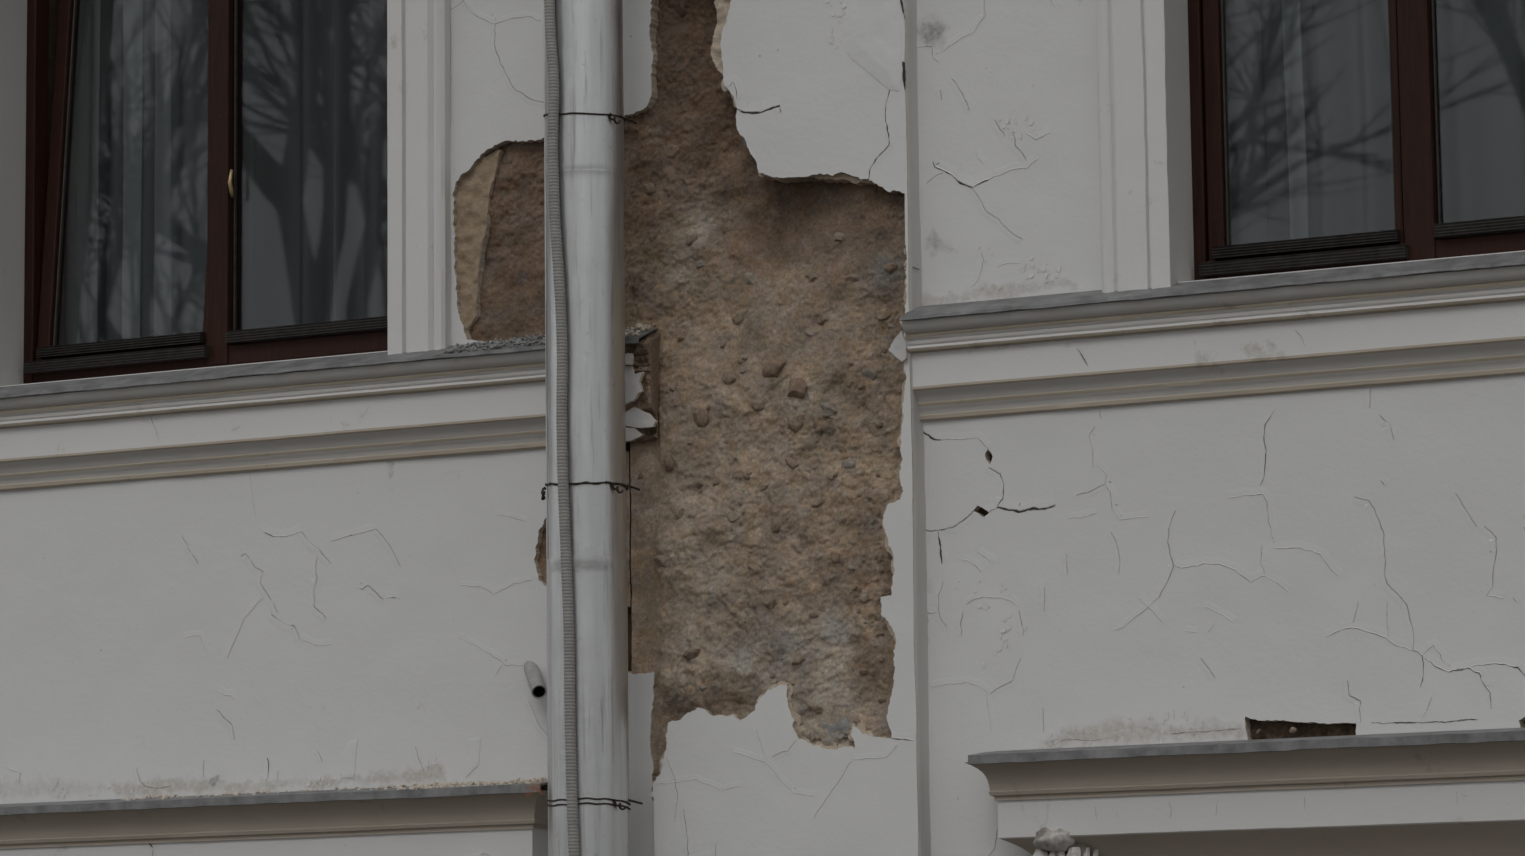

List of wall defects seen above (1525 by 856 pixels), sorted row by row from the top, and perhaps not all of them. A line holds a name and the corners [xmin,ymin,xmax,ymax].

crack [725,74,781,115]
crack [868,90,895,181]
crack [917,40,1050,244]
flaking render [455,142,545,342]
flaking render [624,0,908,777]
crack [923,422,1055,564]
crack [308,522,401,623]
flaking render [538,528,549,585]
crack [1226,407,1525,724]
spalling [1249,719,1356,740]
crack [656,758,742,856]